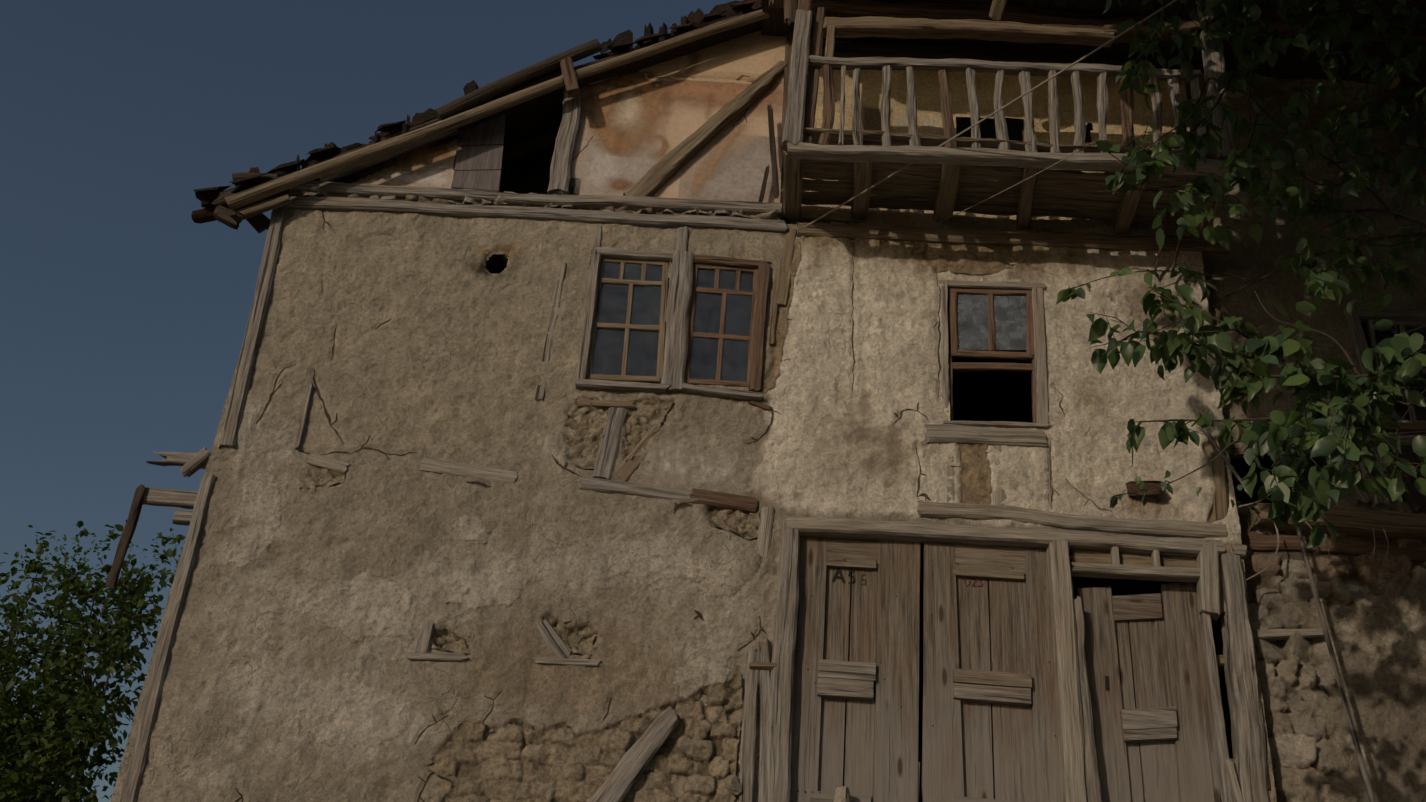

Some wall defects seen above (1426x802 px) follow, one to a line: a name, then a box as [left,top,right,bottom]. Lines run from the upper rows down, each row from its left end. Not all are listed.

damp [616,93,643,126]
damp [581,139,657,193]
crack [256,326,417,491]